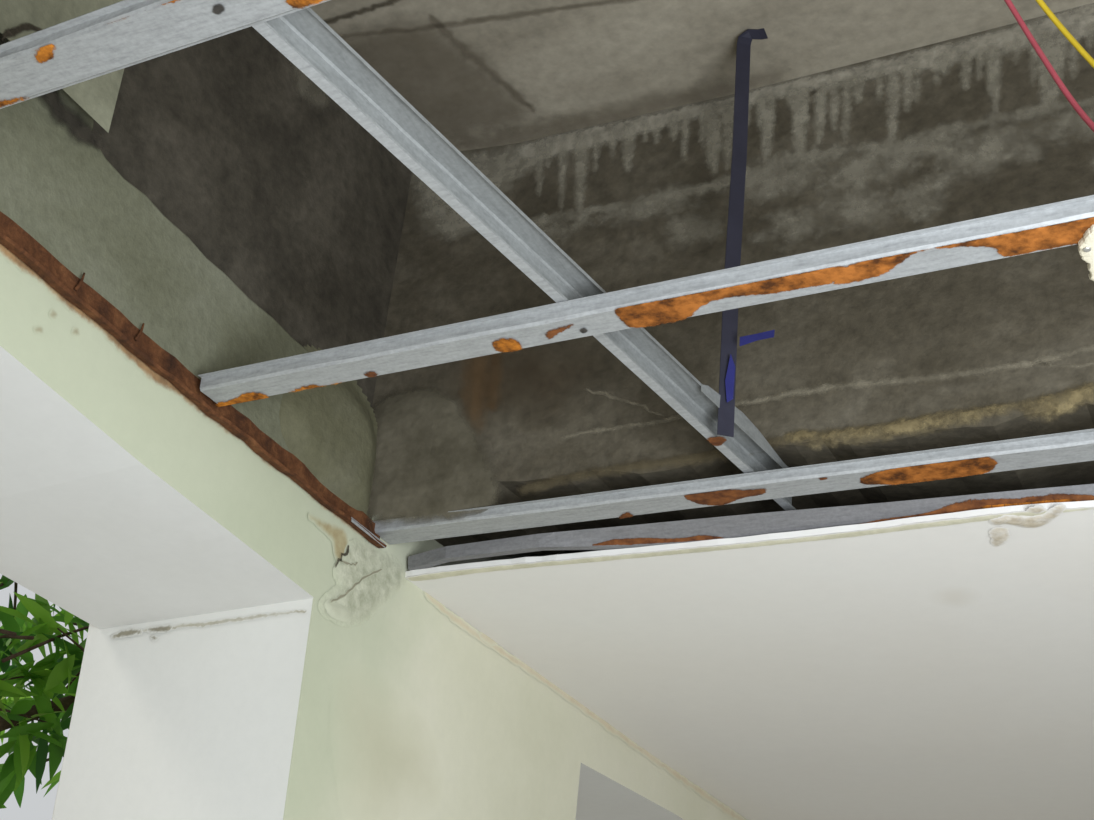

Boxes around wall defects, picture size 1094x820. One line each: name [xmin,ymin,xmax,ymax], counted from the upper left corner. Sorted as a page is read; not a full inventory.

crack [324,0,398,24]
rust [35,44,55,63]
water stain [745,4,1094,219]
water stain [466,97,734,227]
water stain [418,179,471,235]
rust [615,217,1094,328]
rust [0,244,370,562]
rust [860,457,998,485]
rust [684,489,766,506]
rust [860,494,1094,524]
rust [593,535,724,546]
crack [336,545,358,567]